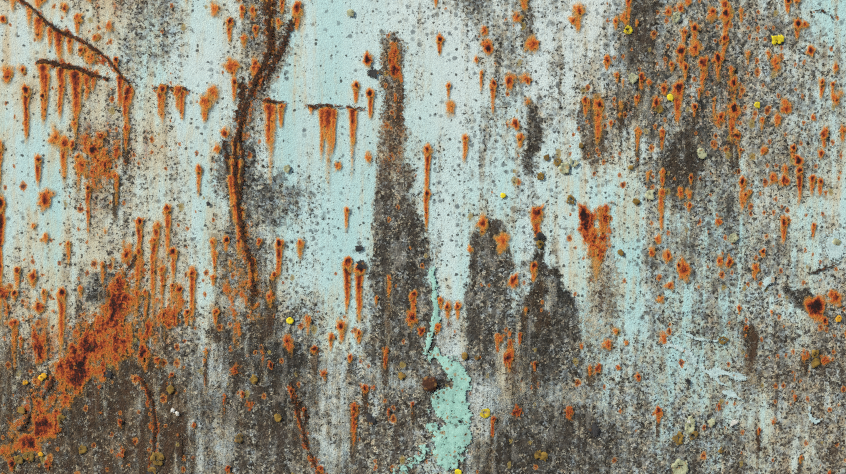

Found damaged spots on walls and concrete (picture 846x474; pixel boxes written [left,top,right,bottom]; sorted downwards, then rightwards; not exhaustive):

corrosion [226,0,303,47]
damp [514,0,536,58]
corrosion [568,3,585,31]
corrosion [222,57,240,101]
corrosion [474,26,532,111]
corrosion [34,153,55,210]
corrosion [577,0,752,303]
corrosion [769,144,823,203]
damp [0,0,358,474]
damp [365,30,630,474]
corrosion [0,195,197,474]
corrosion [405,290,462,336]